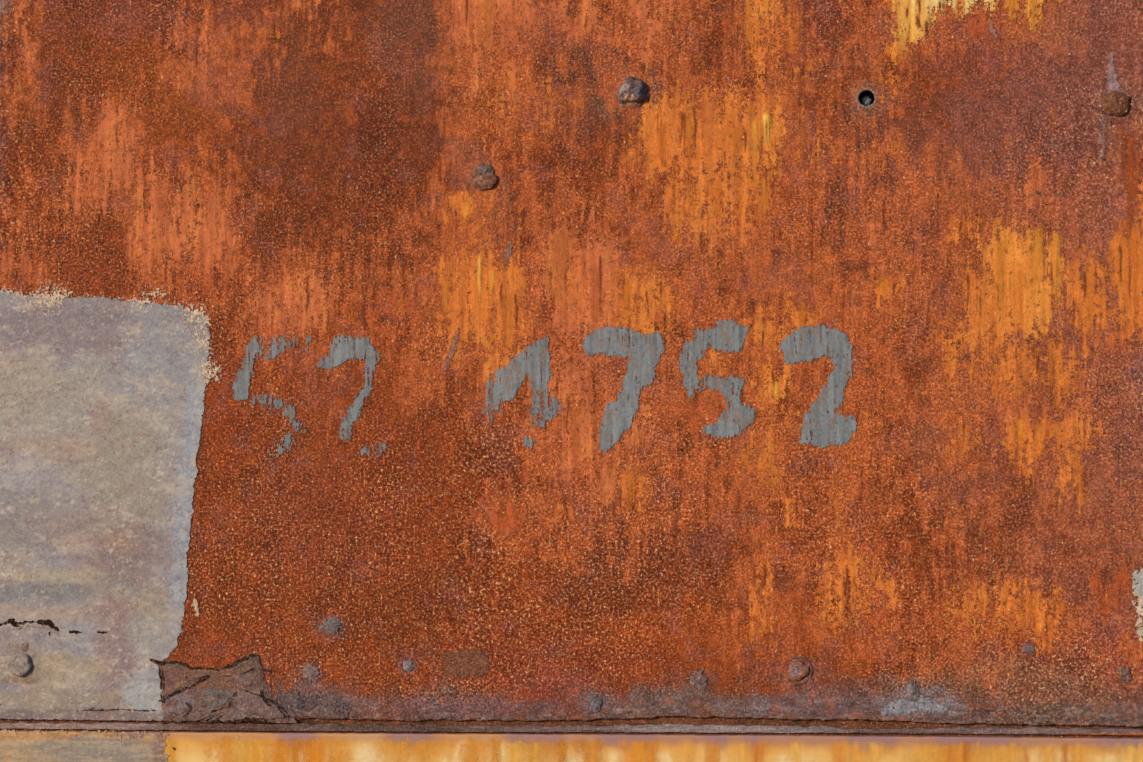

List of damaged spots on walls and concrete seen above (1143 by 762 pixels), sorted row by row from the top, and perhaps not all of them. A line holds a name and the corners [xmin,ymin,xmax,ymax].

corrosion [5,0,39,116]
corrosion [855,60,911,113]
corrosion [0,187,56,291]
corrosion [50,0,901,652]
corrosion [850,118,1143,519]
crack [0,618,107,636]
corrosion [150,653,362,762]
corrosion [935,559,1080,666]
corrosion [1083,551,1132,629]
corrosion [1111,629,1143,683]